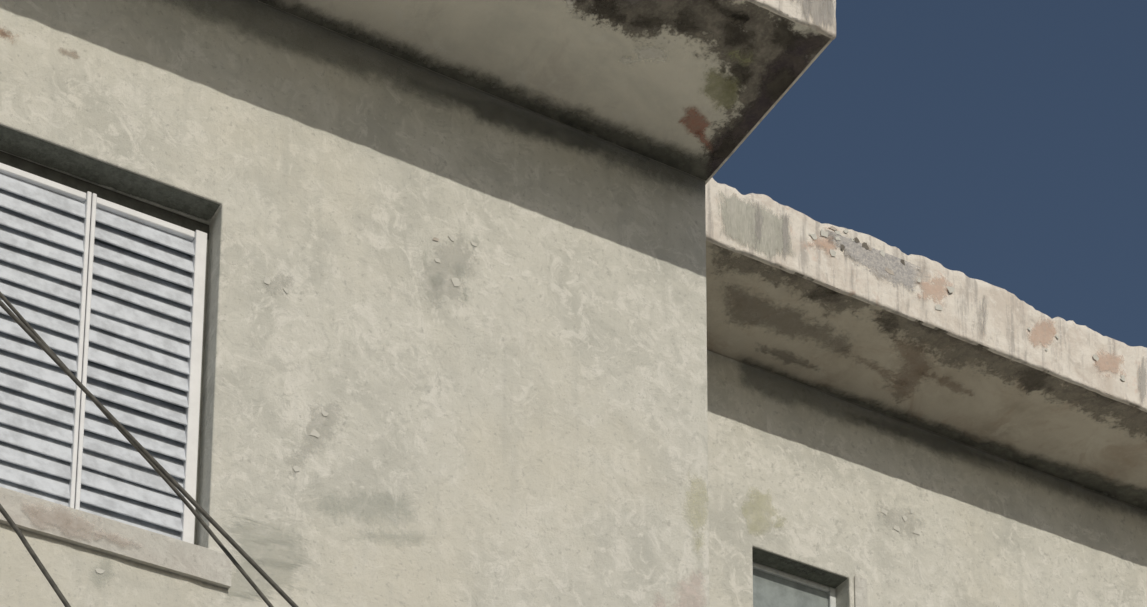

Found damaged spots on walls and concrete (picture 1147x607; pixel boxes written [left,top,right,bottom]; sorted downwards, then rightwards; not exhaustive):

damp [258,0,834,181]
corrosion [680,109,711,149]
spalling [808,226,955,311]
damp [713,194,1147,437]
peeling [1028,321,1059,351]
peeling [1093,351,1125,381]
damp [743,360,1147,510]
damp [752,548,847,588]